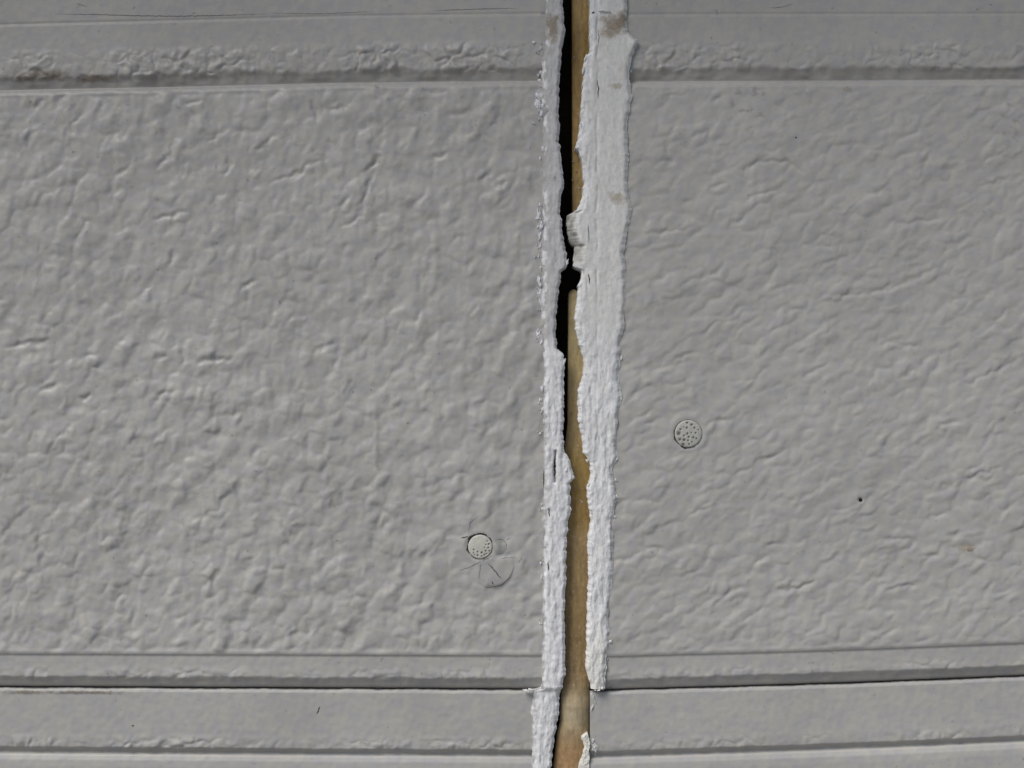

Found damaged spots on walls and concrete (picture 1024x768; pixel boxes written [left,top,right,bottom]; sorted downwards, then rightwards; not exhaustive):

crack [543,0,599,517]